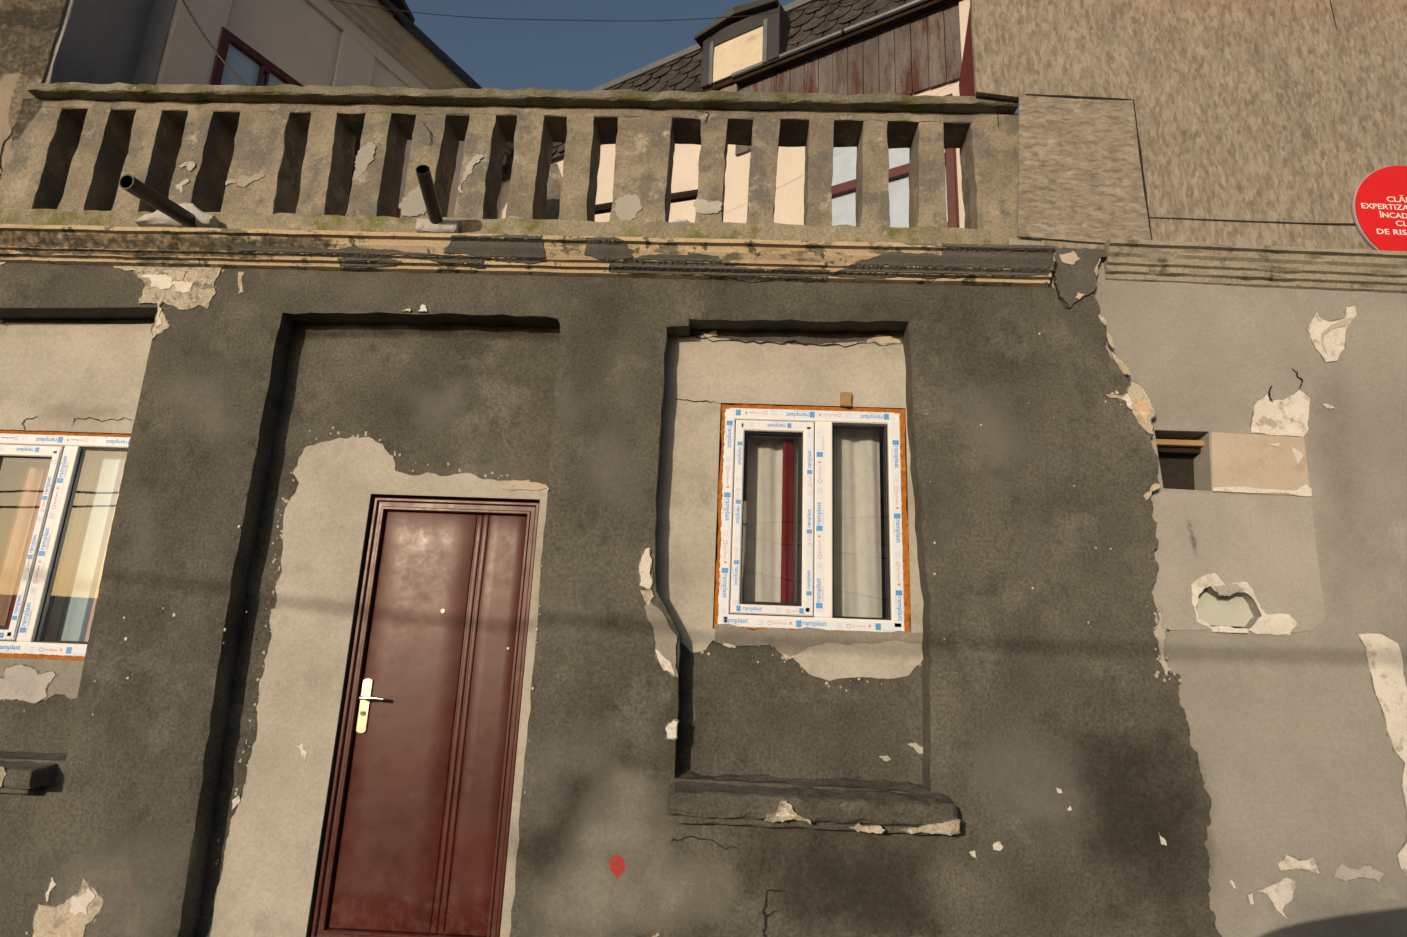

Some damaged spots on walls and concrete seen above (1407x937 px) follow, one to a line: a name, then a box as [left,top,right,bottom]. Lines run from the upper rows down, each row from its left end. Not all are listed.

crack [0,125,15,176]
spalling [113,266,245,340]
peeling [1306,305,1358,363]
peeling [1250,368,1336,464]
peeling [638,548,654,605]
spalling [1191,573,1297,635]
peeling [0,663,58,713]
peeling [655,649,675,677]
peeling [1147,606,1182,682]
peeling [1228,632,1407,921]
spalling [764,800,812,825]
peeling [25,877,106,937]